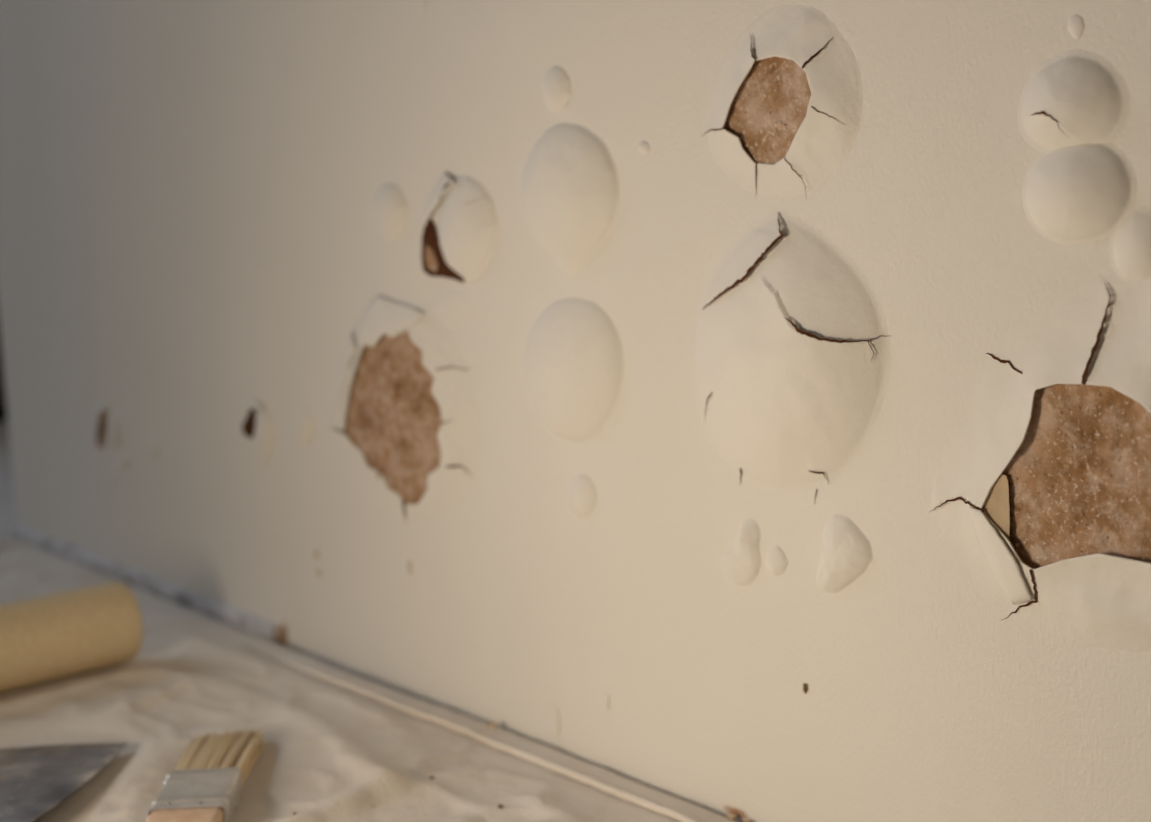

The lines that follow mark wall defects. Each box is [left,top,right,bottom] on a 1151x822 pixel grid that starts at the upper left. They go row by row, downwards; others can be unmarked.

peeling [702,5,863,198]
peeling [328,296,481,521]
peeling [931,274,1151,652]